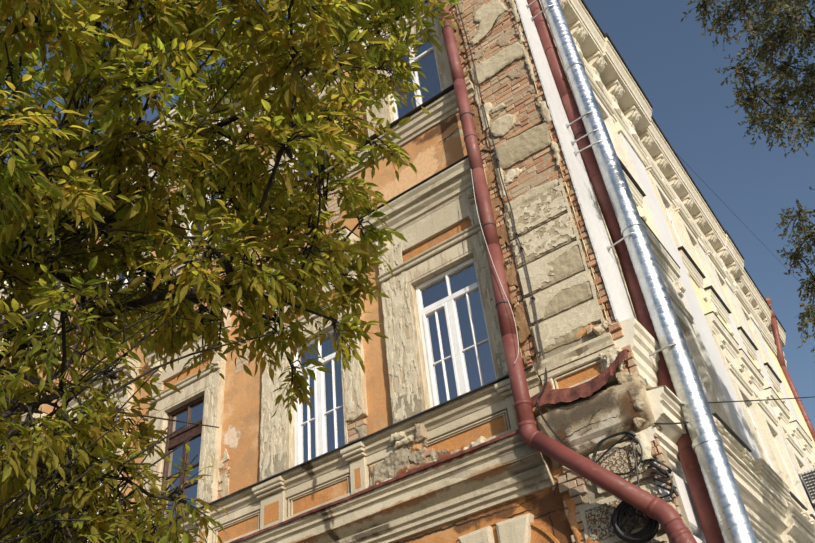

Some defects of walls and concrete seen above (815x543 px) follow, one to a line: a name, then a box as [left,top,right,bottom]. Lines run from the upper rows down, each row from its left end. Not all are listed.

spalling [447,0,685,524]
peeling [198,369,231,507]
peeling [235,340,287,481]
damp [320,508,339,543]
peeling [343,339,367,443]
peeling [369,237,486,486]
spalling [557,466,599,543]
crack [563,408,623,439]